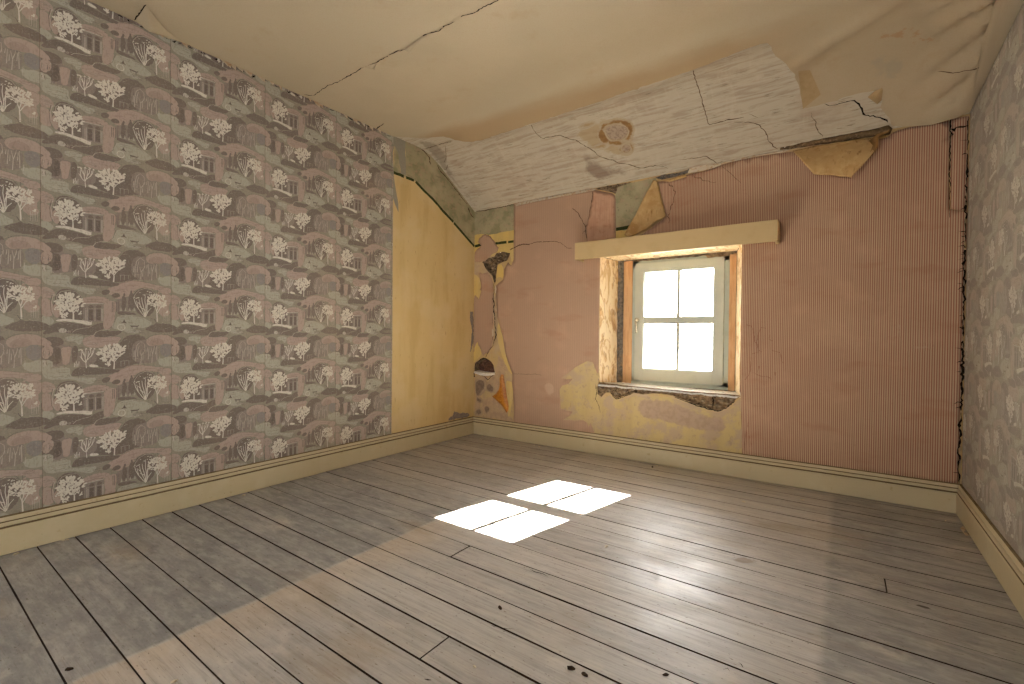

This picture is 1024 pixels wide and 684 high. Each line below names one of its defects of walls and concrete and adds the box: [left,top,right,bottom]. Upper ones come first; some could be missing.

crack [308,0,498,96]
water stain [572,114,640,185]
crack [693,71,777,149]
peeling [780,125,892,178]
crack [811,100,888,137]
peeling [586,169,689,242]
flaking render [483,252,510,283]
crack [954,117,969,482]
flaking render [448,355,513,422]
flaking render [595,382,740,412]